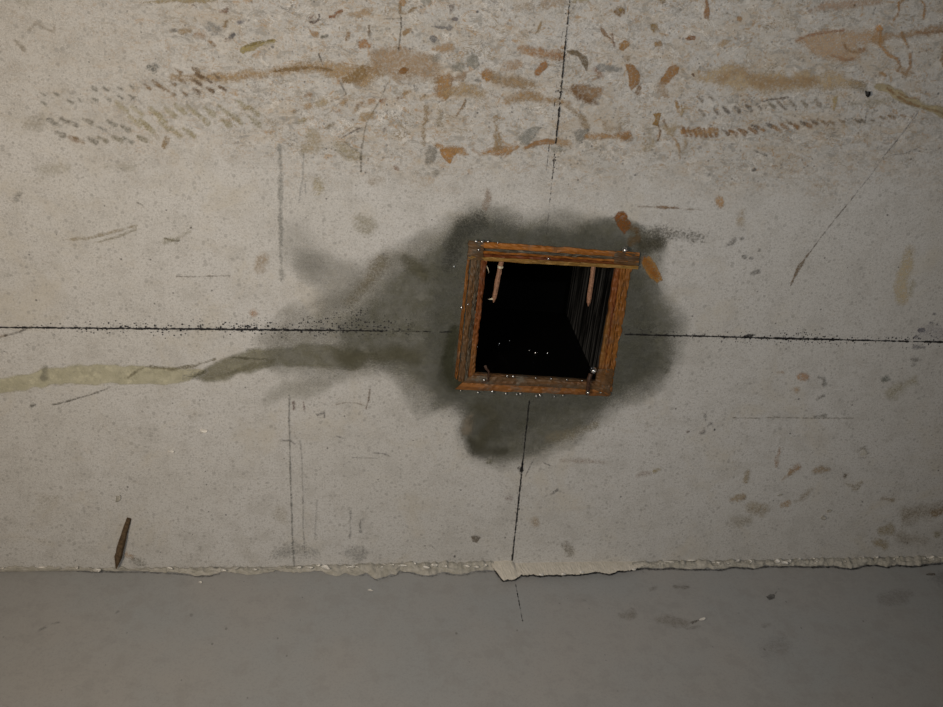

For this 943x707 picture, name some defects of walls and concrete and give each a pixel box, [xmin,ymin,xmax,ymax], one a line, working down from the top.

corrosion [615,211,638,242]
corrosion [642,256,662,282]
leakage [0,220,698,456]
peeling [463,560,646,582]